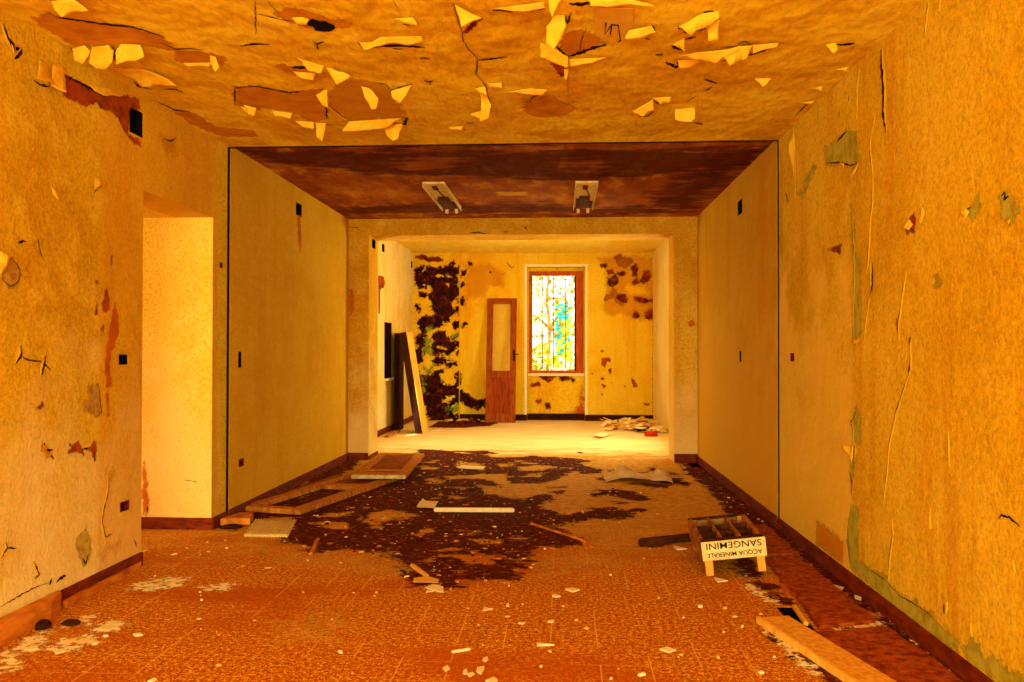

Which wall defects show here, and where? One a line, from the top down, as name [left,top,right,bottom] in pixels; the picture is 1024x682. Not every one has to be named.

peeling [30,0,232,147]
peeling [232,58,412,141]
crack [451,3,505,119]
peeling [448,0,655,131]
peeling [632,97,702,125]
peeling [656,11,780,69]
crack [848,48,888,341]
crack [15,345,51,376]
rust [105,306,119,417]
crack [882,271,912,580]
crack [0,543,66,605]
peeling [846,504,1024,682]